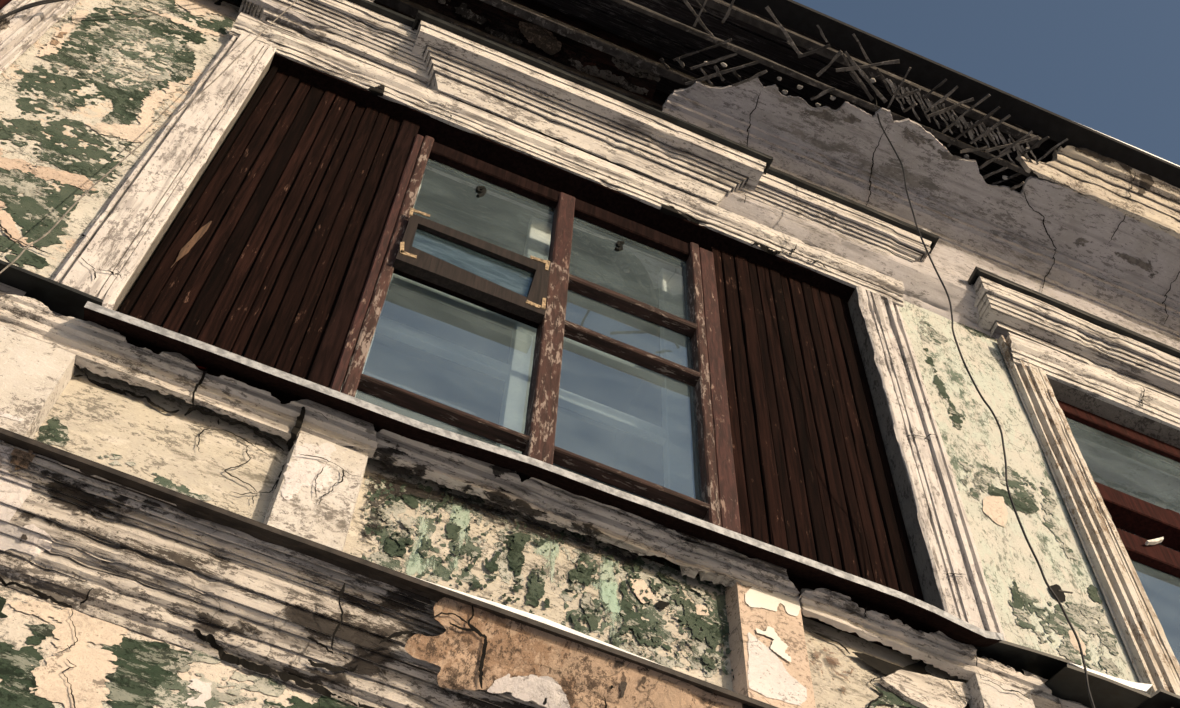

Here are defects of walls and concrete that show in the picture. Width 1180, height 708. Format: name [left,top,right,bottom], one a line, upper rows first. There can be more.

peeling [0,0,235,268]
crack [866,127,887,206]
crack [1024,192,1057,292]
flaking render [0,411,70,558]
crack [73,364,360,505]
peeling [960,461,1079,560]
crack [0,576,93,708]
flaking render [0,596,357,708]
crack [193,583,375,708]
crack [379,605,488,689]
flaking render [350,476,807,708]
peeling [1009,577,1120,678]